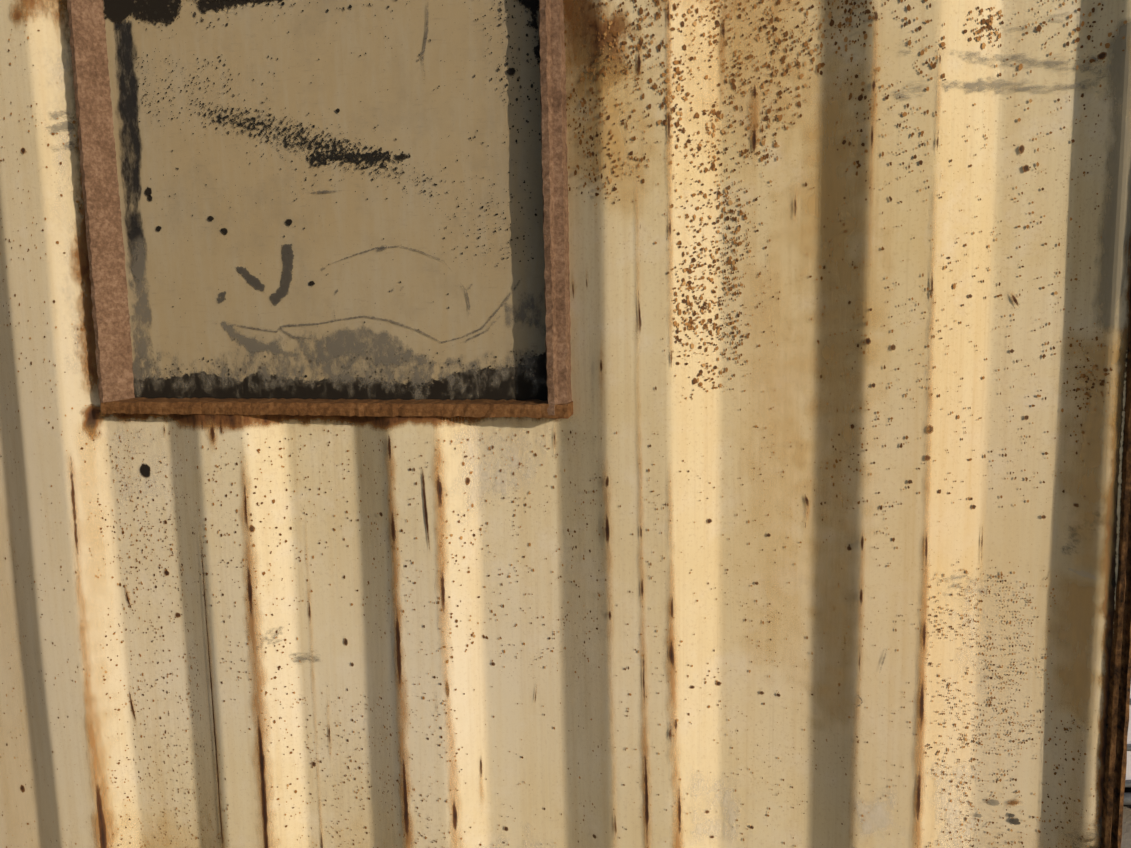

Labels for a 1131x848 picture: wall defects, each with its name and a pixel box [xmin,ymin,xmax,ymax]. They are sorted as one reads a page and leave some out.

rust [0,0,70,75]
water stain [104,0,548,401]
rust [30,404,723,848]
rust [592,598,807,848]
rust [797,93,1099,567]
rust [840,236,1131,848]